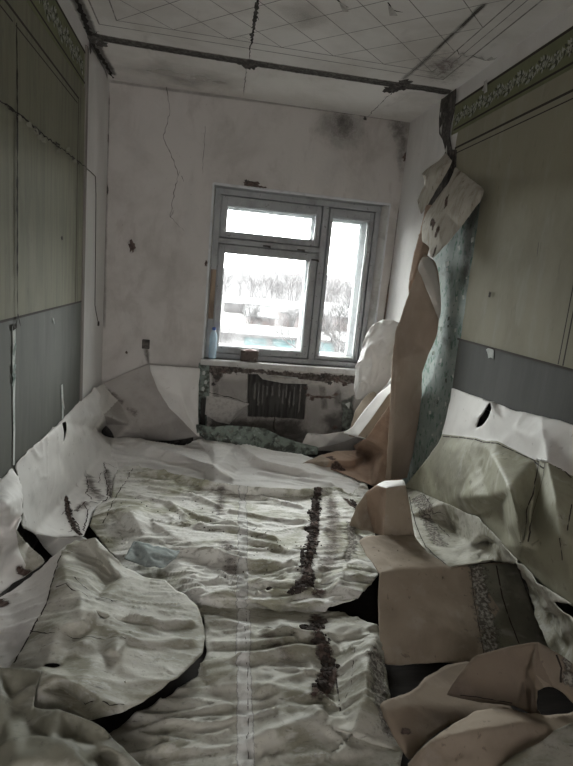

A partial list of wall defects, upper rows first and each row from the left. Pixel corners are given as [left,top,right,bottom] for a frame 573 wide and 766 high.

crack [72,0,450,117]
spalling [198,179,391,430]
peeling [402,201,481,485]